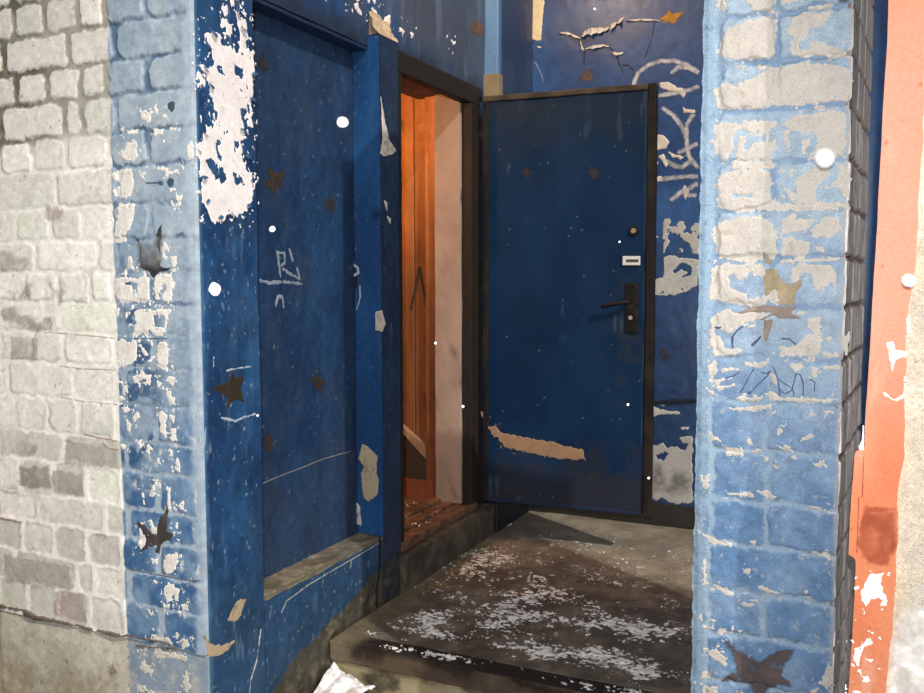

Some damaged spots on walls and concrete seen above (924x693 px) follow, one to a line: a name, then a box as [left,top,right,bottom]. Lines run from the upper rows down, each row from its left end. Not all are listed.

spalling [345,0,417,43]
peeling [532,0,545,48]
crack [559,16,660,73]
spalling [380,99,396,156]
peeling [654,0,854,460]
peeling [19,0,259,693]
spalling [375,310,386,332]
peeling [886,341,908,371]
spalling [357,444,379,525]
peeling [652,427,711,504]
peeling [854,570,891,620]
crack [0,604,178,650]